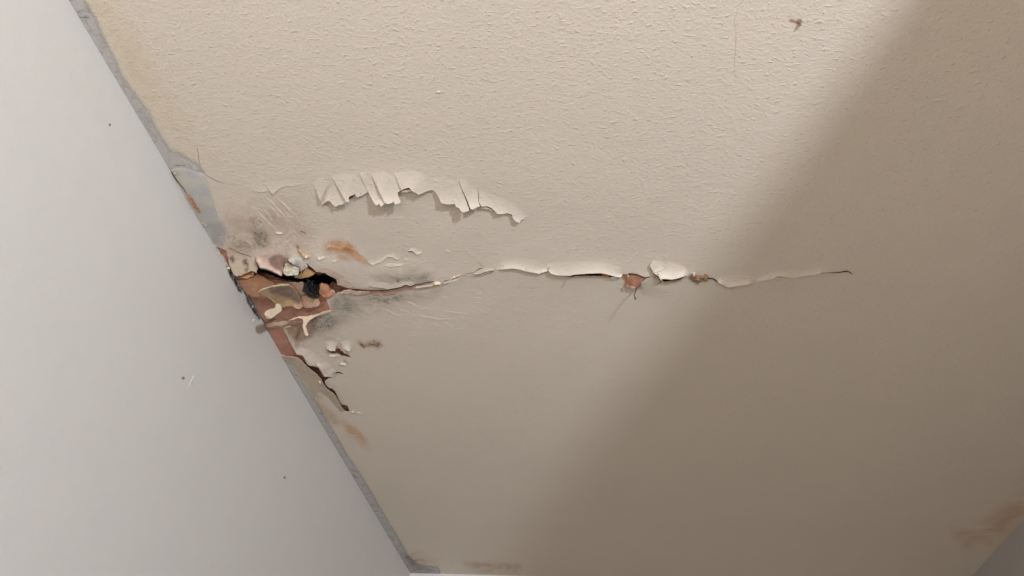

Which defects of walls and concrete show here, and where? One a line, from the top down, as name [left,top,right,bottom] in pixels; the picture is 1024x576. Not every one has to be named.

peeling [313,170,528,223]
peeling [227,248,258,276]
water stain [226,216,283,275]
peeling [258,262,331,336]
crack [352,258,852,297]
peeling [324,339,381,365]